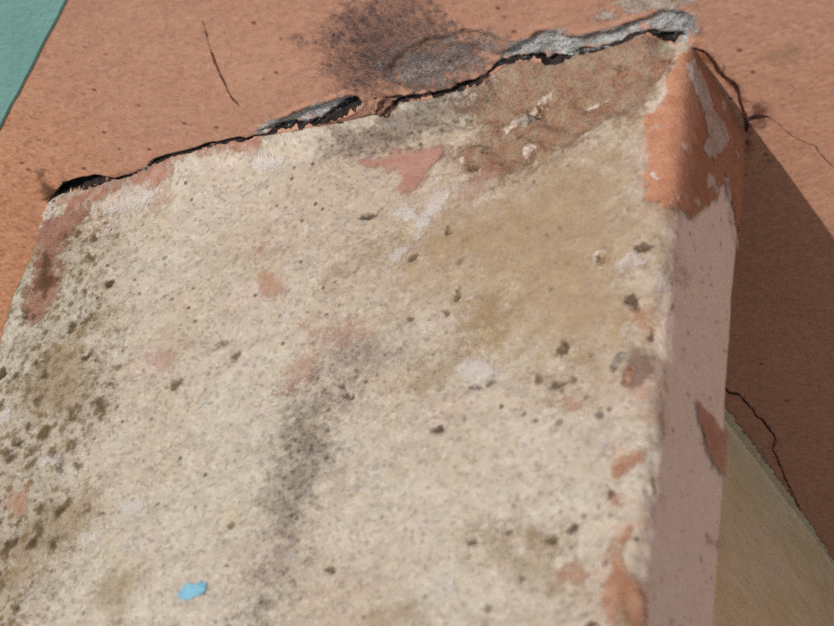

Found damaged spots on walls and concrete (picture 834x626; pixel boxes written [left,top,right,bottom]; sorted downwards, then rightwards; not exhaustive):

damp [305,0,454,91]
spalling [255,95,363,134]
crack [47,21,833,203]
peeling [376,9,746,247]
peeling [697,401,727,477]
crack [725,388,800,510]